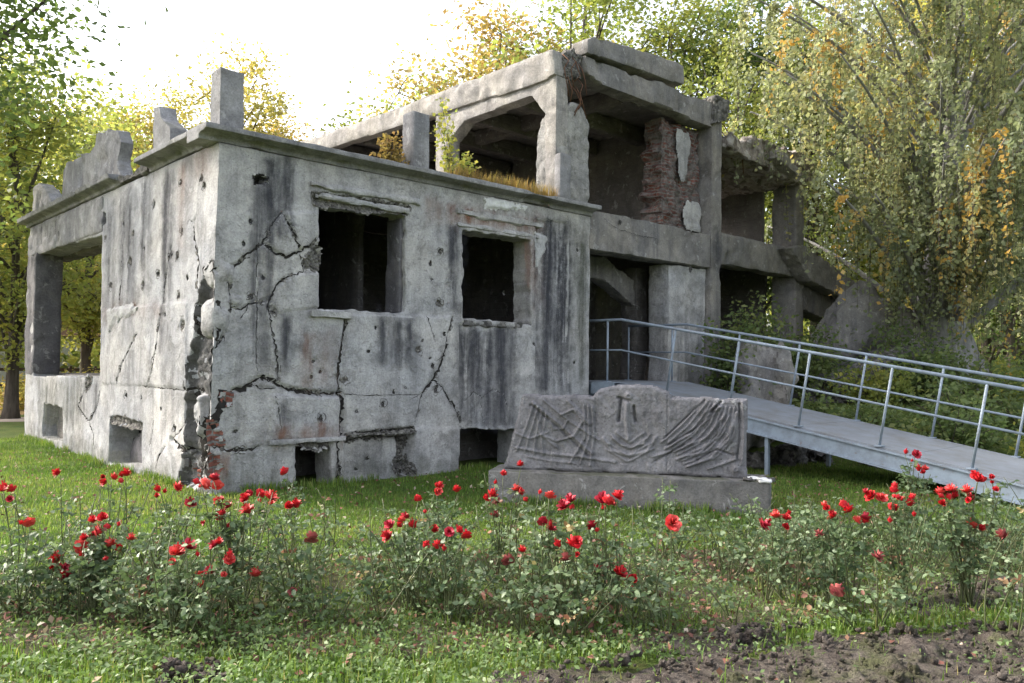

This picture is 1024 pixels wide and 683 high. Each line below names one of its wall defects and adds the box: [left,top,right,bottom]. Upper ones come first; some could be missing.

peeling [676,128,691,182]
peeling [683,200,702,233]
water stain [534,224,571,390]
flaking render [219,391,234,408]
crack [78,212,506,494]
water stain [459,328,514,423]
flaking render [205,419,238,477]